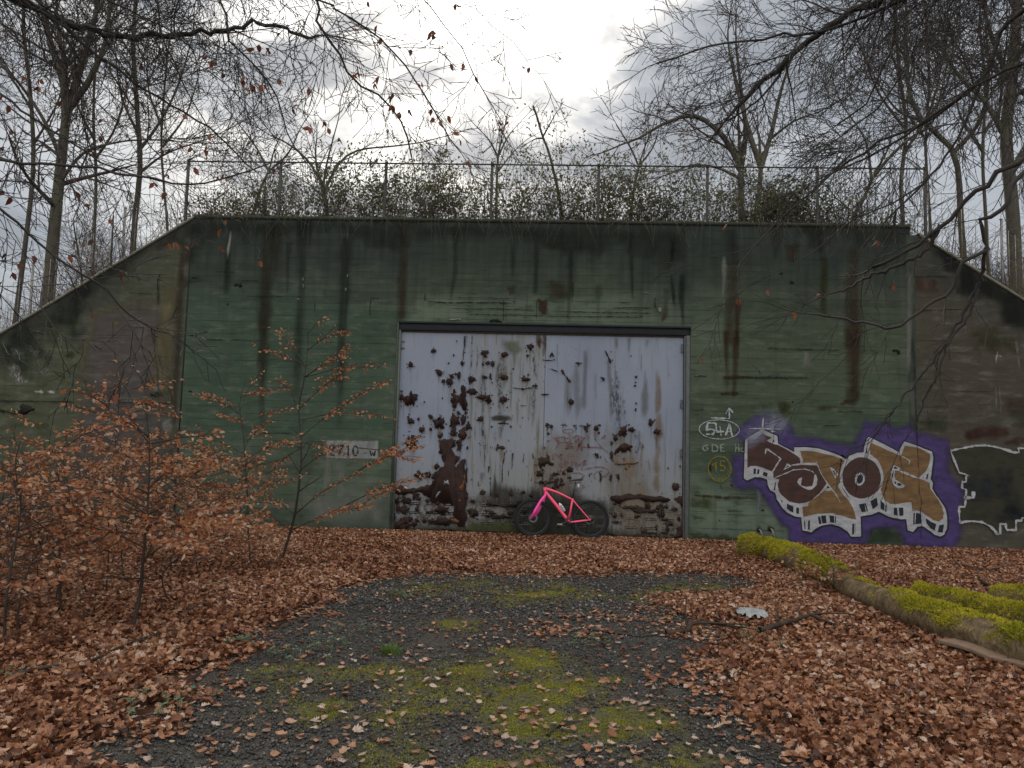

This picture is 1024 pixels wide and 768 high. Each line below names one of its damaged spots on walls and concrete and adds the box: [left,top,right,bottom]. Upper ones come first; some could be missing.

damp [186,220,487,388]